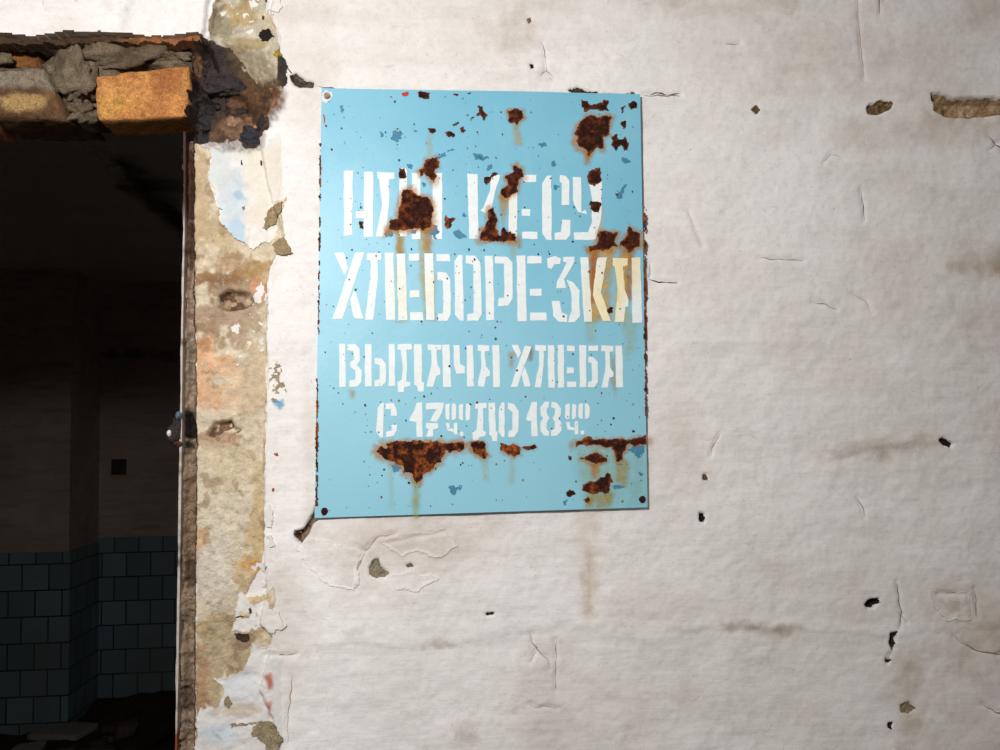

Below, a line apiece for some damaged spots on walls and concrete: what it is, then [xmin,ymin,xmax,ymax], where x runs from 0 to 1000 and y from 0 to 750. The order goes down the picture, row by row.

flaking render [0,0,314,750]
flaking render [931,95,1000,119]